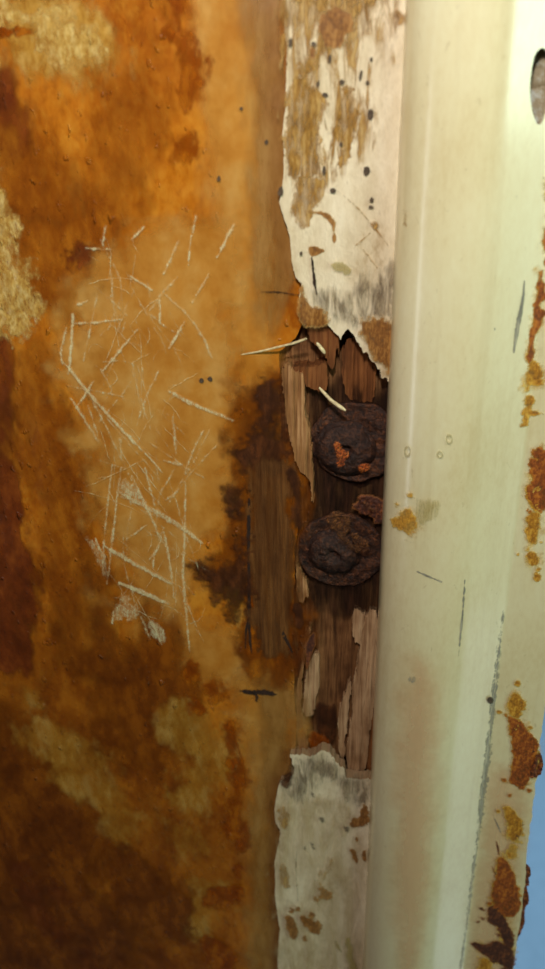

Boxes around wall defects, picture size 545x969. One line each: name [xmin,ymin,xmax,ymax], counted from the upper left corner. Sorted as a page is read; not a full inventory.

rust [520,230,545,427]
rust [327,493,417,553]
rust [517,447,545,582]
rust [471,680,540,969]